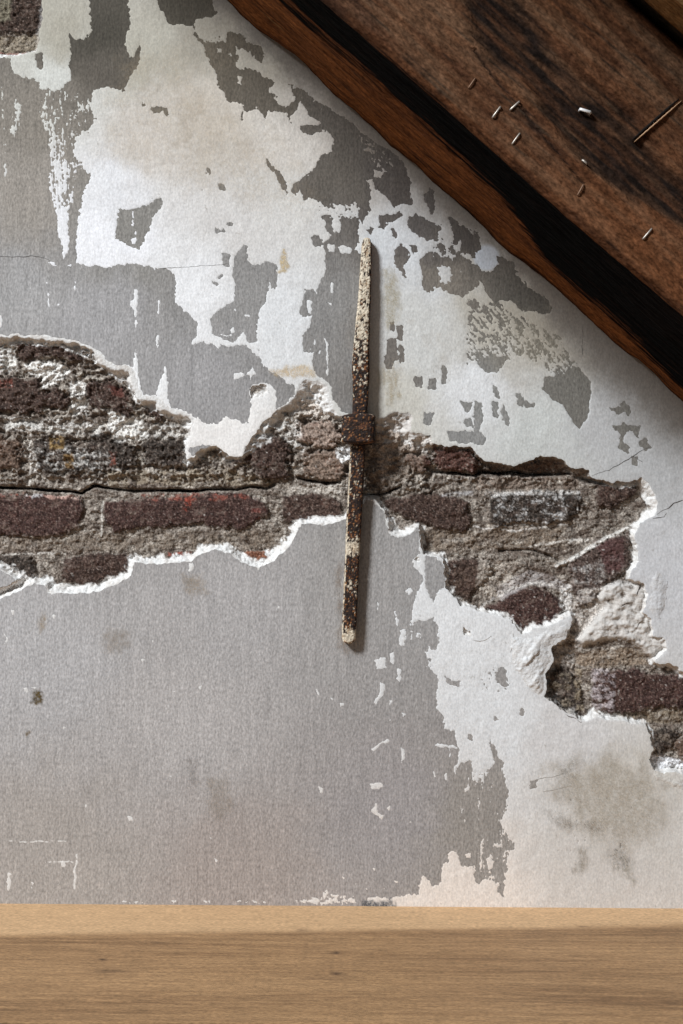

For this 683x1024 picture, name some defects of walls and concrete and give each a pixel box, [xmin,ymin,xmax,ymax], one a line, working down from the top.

peeling [355,219,364,254]
peeling [481,256,552,314]
peeling [234,367,256,380]
peeling [384,338,404,369]
peeling [472,342,509,373]
peeling [542,364,591,429]
peeling [448,401,486,445]
peeling [613,422,640,453]
crack [0,475,266,503]
peeling [394,611,421,646]
peeling [374,652,402,682]
peeling [45,854,78,889]